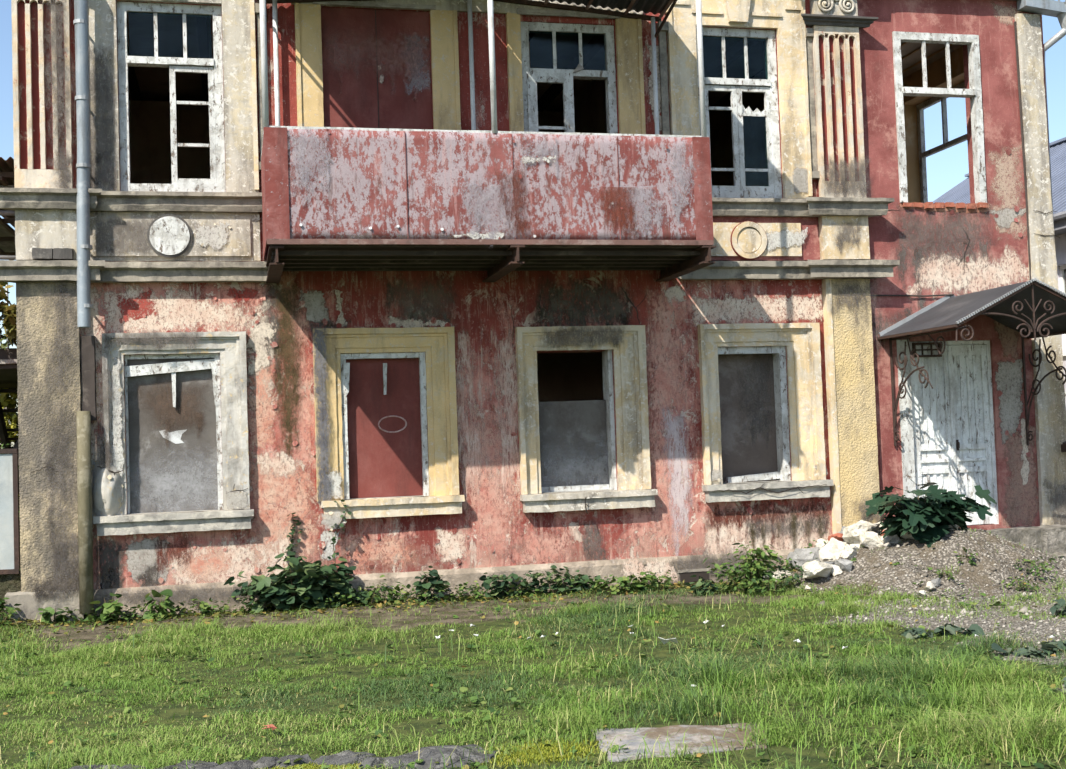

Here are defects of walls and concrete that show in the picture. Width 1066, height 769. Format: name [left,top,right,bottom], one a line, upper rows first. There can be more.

water stain [88,47,117,189]
peeling [288,127,332,205]
peeling [454,138,558,239]
peeling [619,142,694,239]
water stain [826,160,867,197]
peeling [899,144,1029,299]
peeling [82,285,278,502]
water stain [267,286,299,457]
water stain [309,321,350,503]
water stain [535,278,634,347]
water stain [652,343,828,581]
peeling [663,283,824,335]